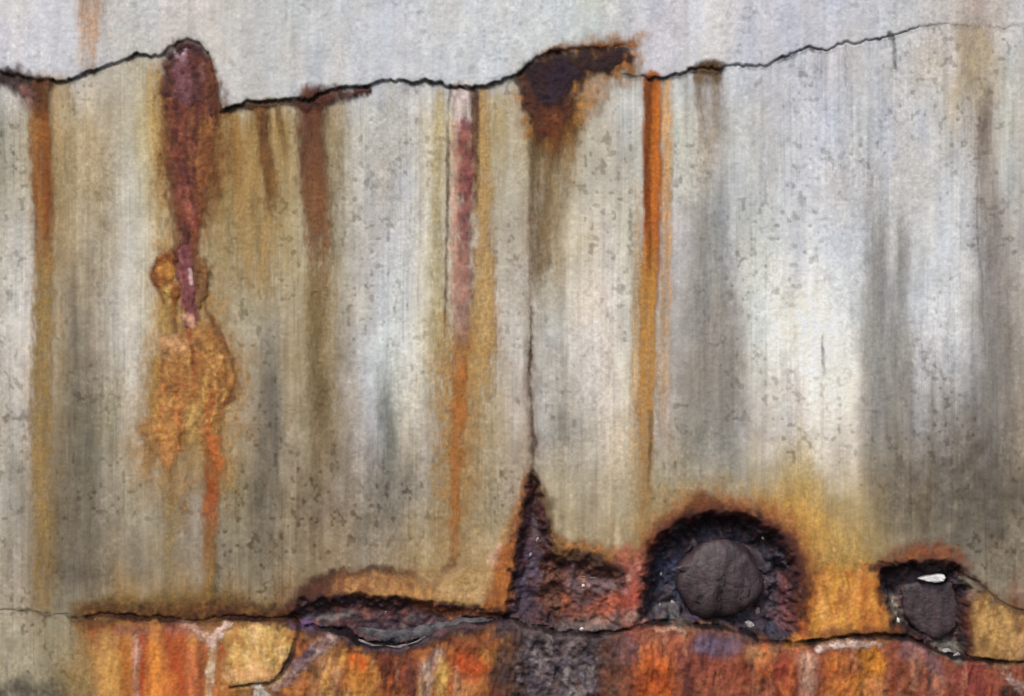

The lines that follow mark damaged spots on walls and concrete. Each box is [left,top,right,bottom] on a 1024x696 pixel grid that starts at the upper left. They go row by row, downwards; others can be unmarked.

crack [50,52,152,84]
crack [222,100,256,113]
crack [286,69,524,103]
crack [621,70,690,81]
crack [747,46,835,68]
corrosion [515,36,672,479]
corrosion [0,66,61,571]
corrosion [71,40,516,696]
spalling [285,474,816,696]
spalling [869,543,976,662]
crack [326,625,421,649]
crack [642,620,1007,664]